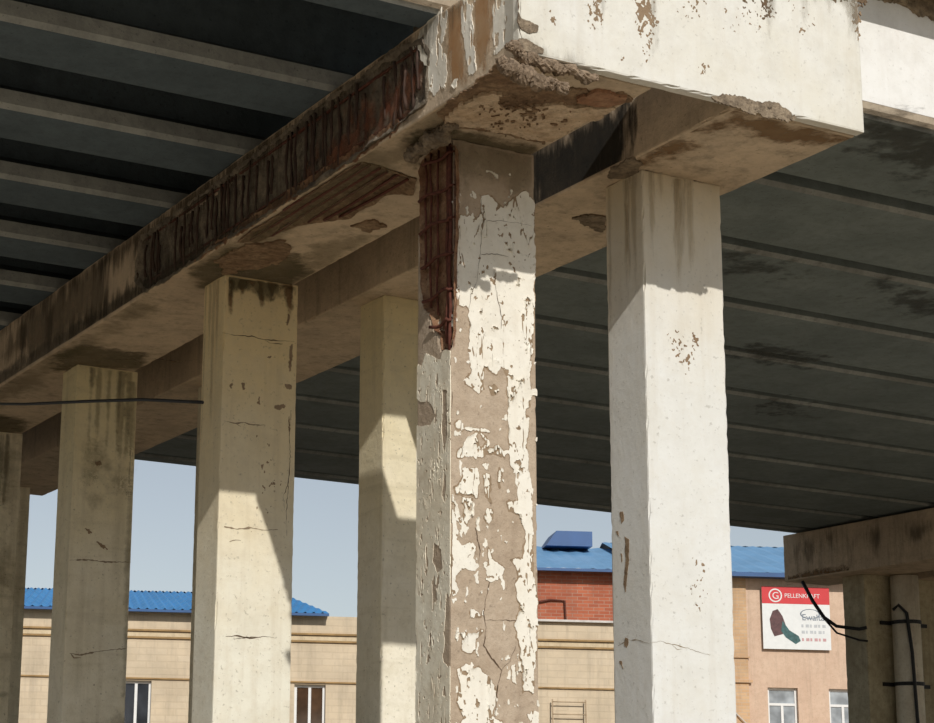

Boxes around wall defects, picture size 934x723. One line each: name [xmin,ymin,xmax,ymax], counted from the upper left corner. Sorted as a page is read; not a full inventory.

peeling [635,0,659,63]
peeling [723,0,777,32]
peeling [833,0,867,41]
spalling [878,0,934,21]
leakage [451,103,637,204]
leakage [189,249,313,310]
leakage [51,345,145,370]
peeling [134,0,633,723]
leakage [0,416,26,433]
crack [224,419,291,542]
crack [70,648,126,659]
crack [483,582,516,712]